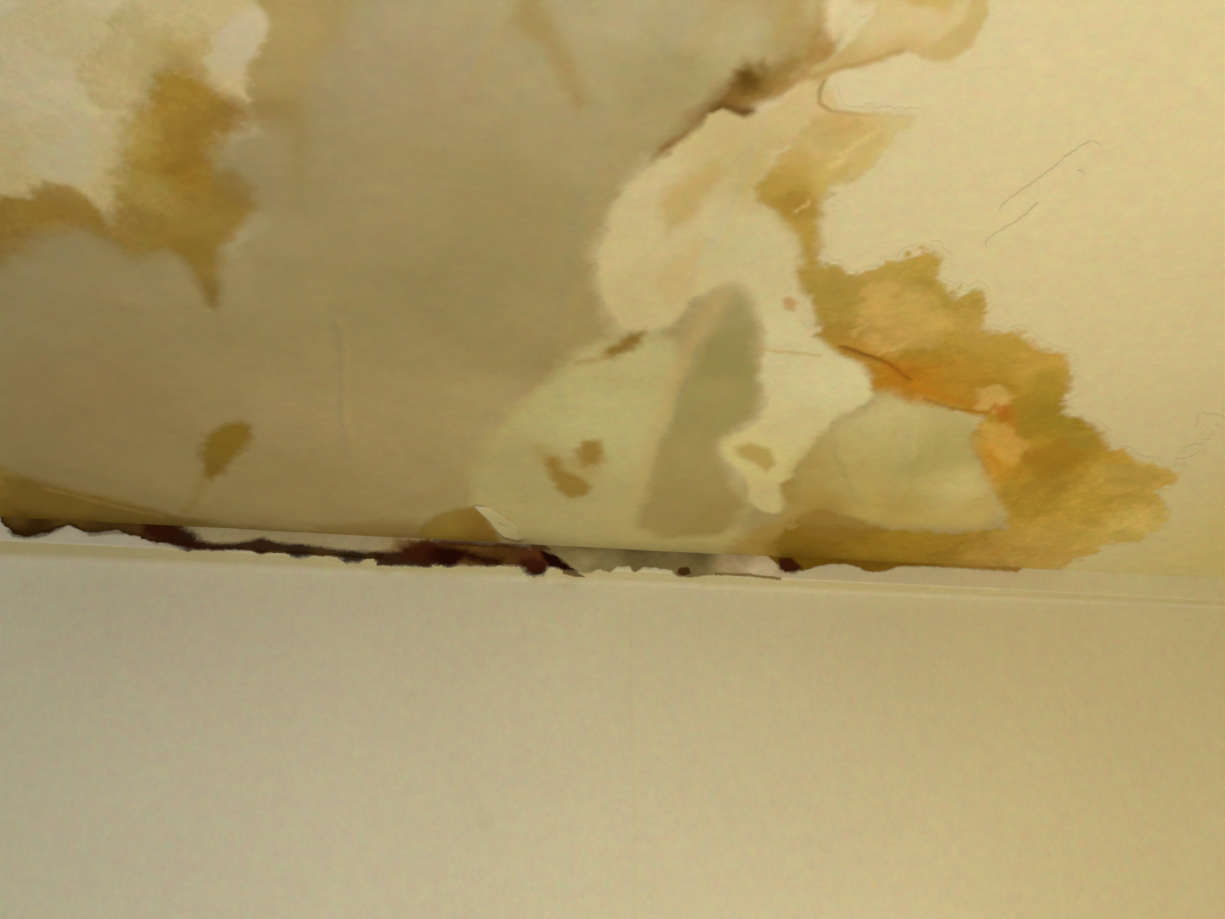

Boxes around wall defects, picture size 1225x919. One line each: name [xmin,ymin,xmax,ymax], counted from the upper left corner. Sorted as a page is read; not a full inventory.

damp [0,0,1225,578]
peeling [474,506,527,542]
peeling [545,545,783,580]